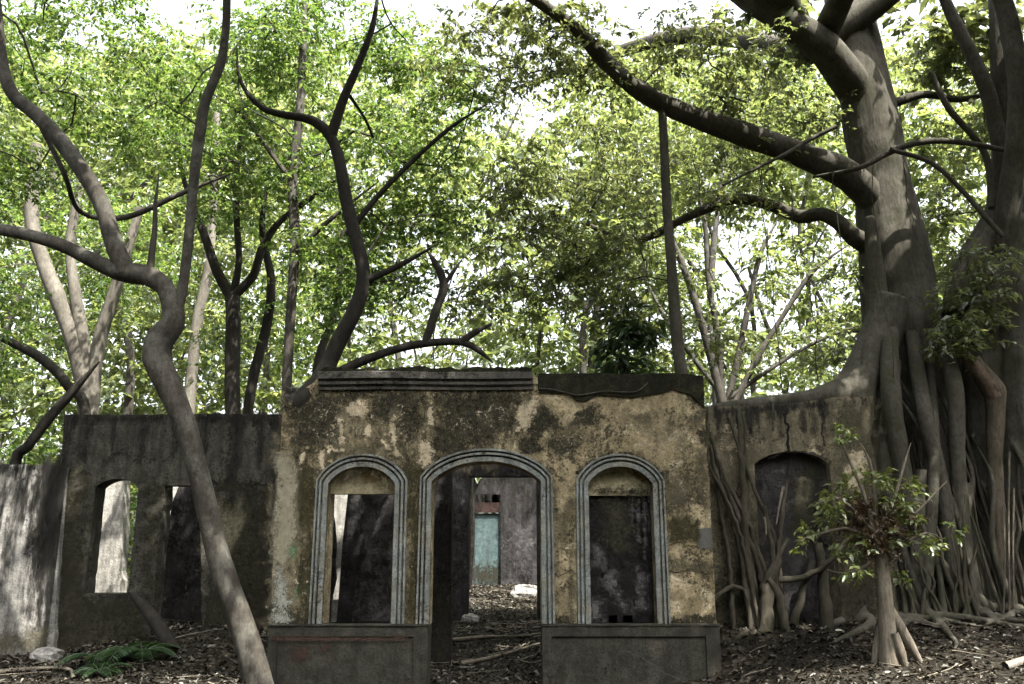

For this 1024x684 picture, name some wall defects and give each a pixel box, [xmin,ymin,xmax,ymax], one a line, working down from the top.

flaking render [271,394,436,603]
leakage [195,382,891,665]
crack [768,407,826,479]